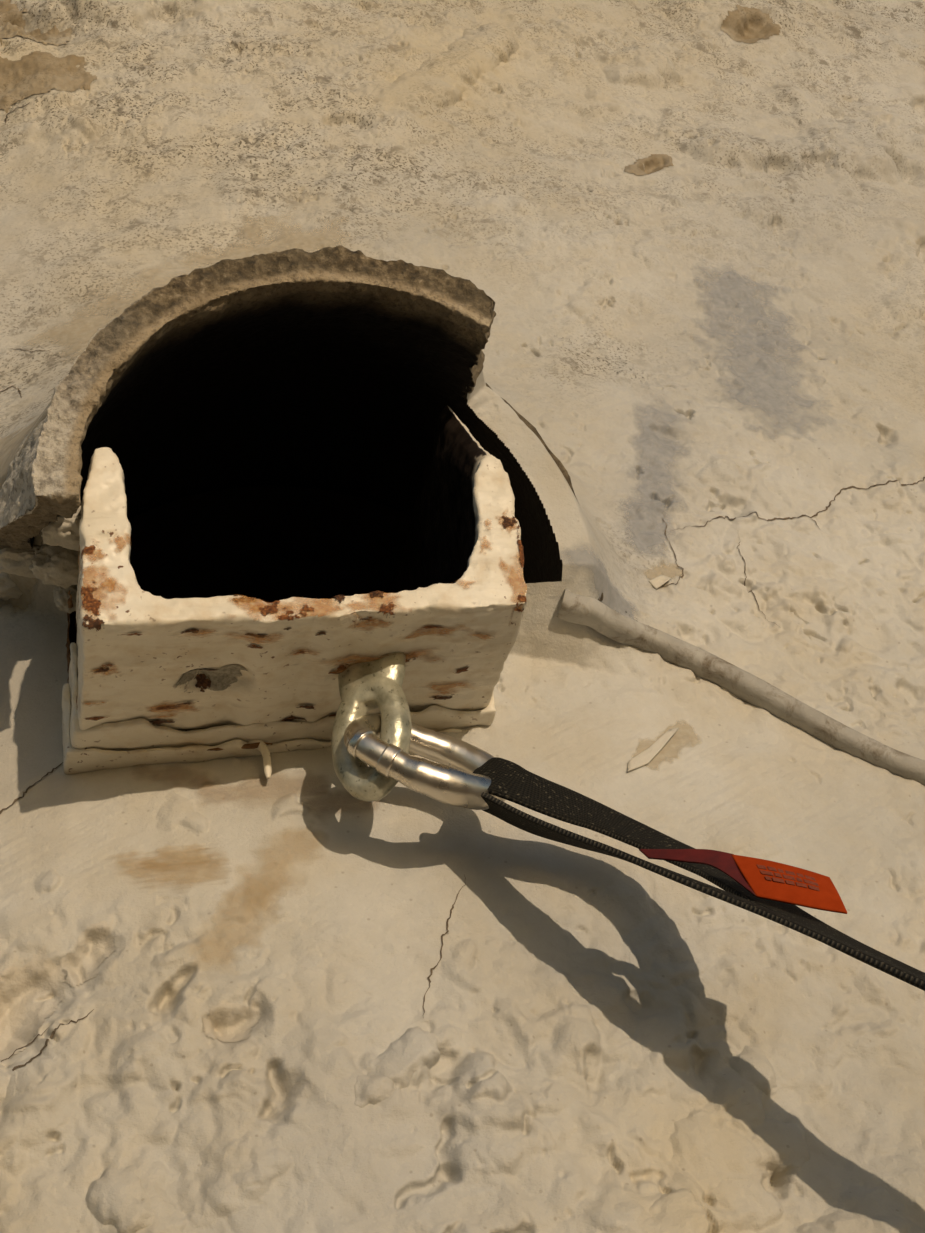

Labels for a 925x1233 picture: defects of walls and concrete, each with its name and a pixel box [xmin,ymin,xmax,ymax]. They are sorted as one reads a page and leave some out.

spalling [0,0,97,113]
crack [660,477,925,628]
rust [75,545,116,631]
rust [229,591,396,649]
rust [404,626,455,663]
rust [430,666,470,700]
rust [149,701,199,725]
rust [282,705,314,721]
crack [0,762,63,814]